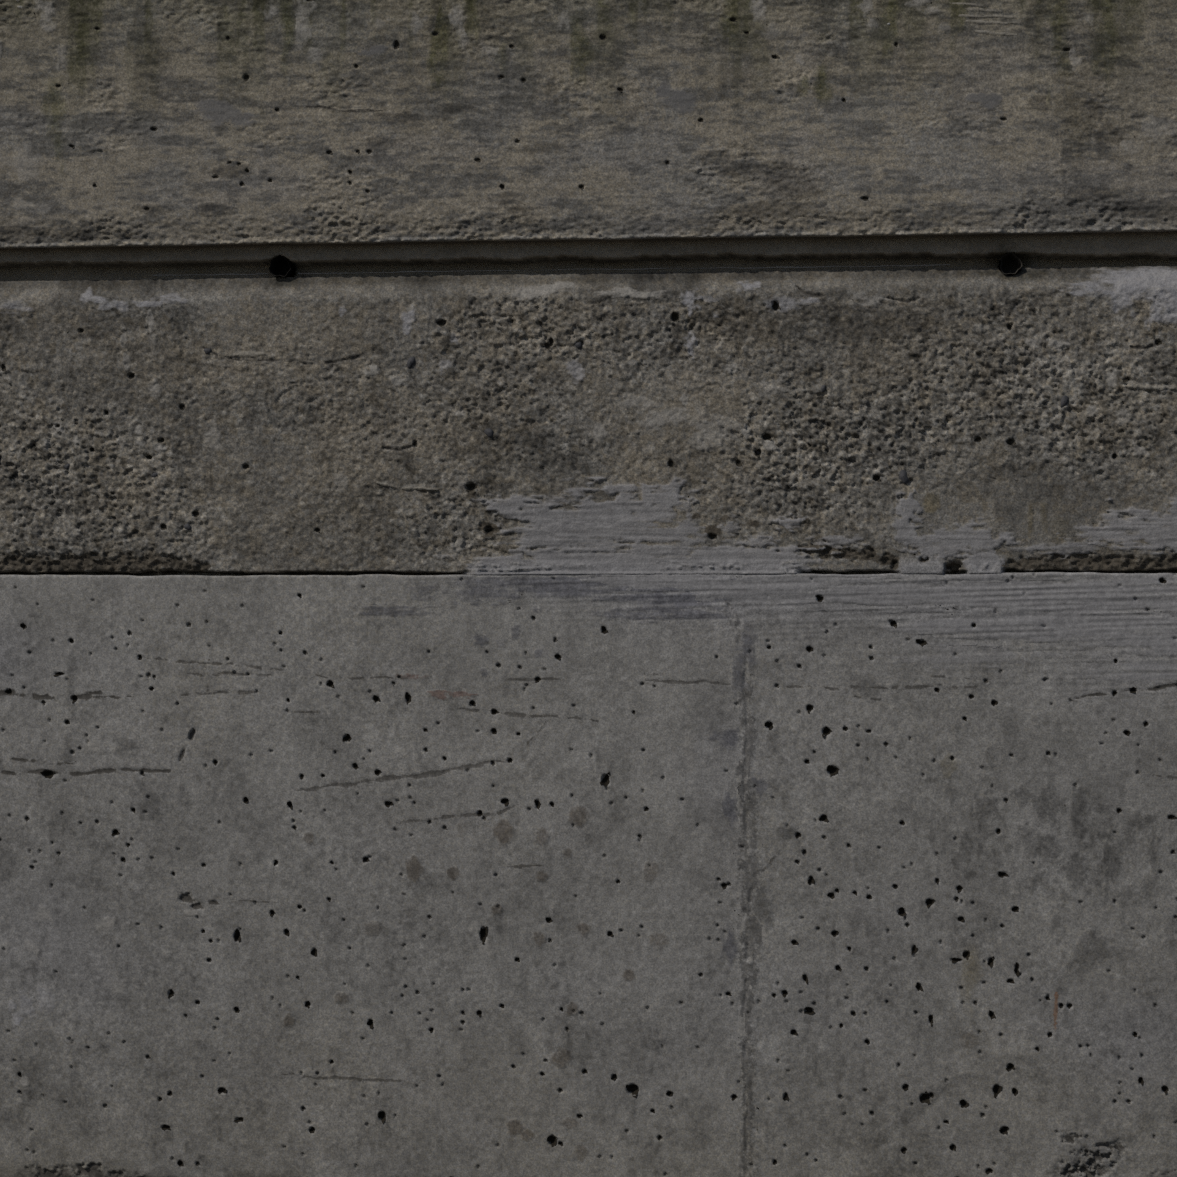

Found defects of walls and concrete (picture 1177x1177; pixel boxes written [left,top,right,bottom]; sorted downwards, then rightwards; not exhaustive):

leakage [0,0,112,243]
leakage [261,0,330,97]
leakage [353,0,515,151]
leakage [555,4,613,98]
leakage [651,0,784,118]
leakage [852,0,973,75]
leakage [1016,0,1177,220]
leakage [127,200,238,218]
leakage [686,146,838,223]
spalling [445,520,519,553]
spalling [691,510,732,540]
spalling [999,551,1177,573]